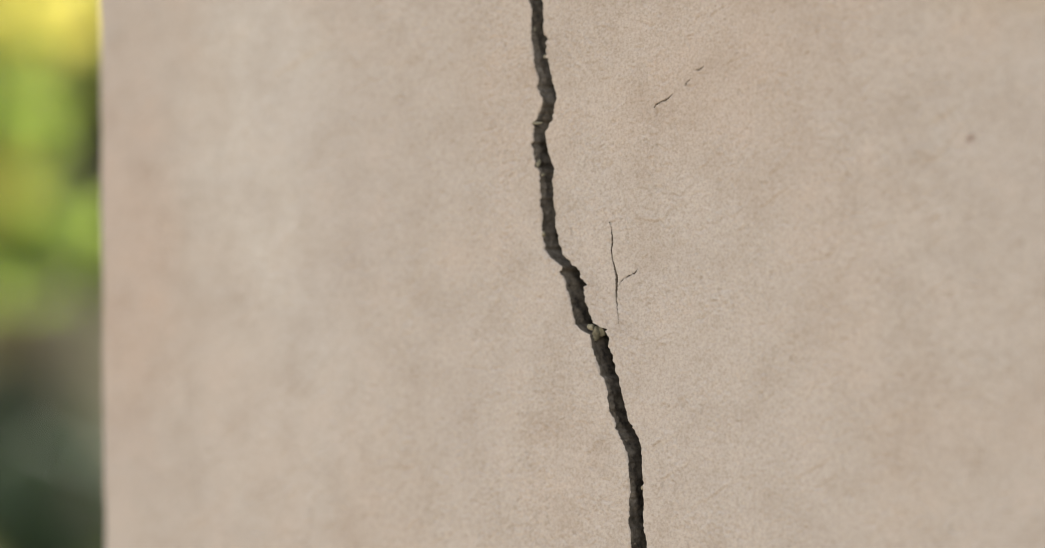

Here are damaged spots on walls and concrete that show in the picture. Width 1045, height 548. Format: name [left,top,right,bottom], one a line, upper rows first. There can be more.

crack [529,0,647,548]